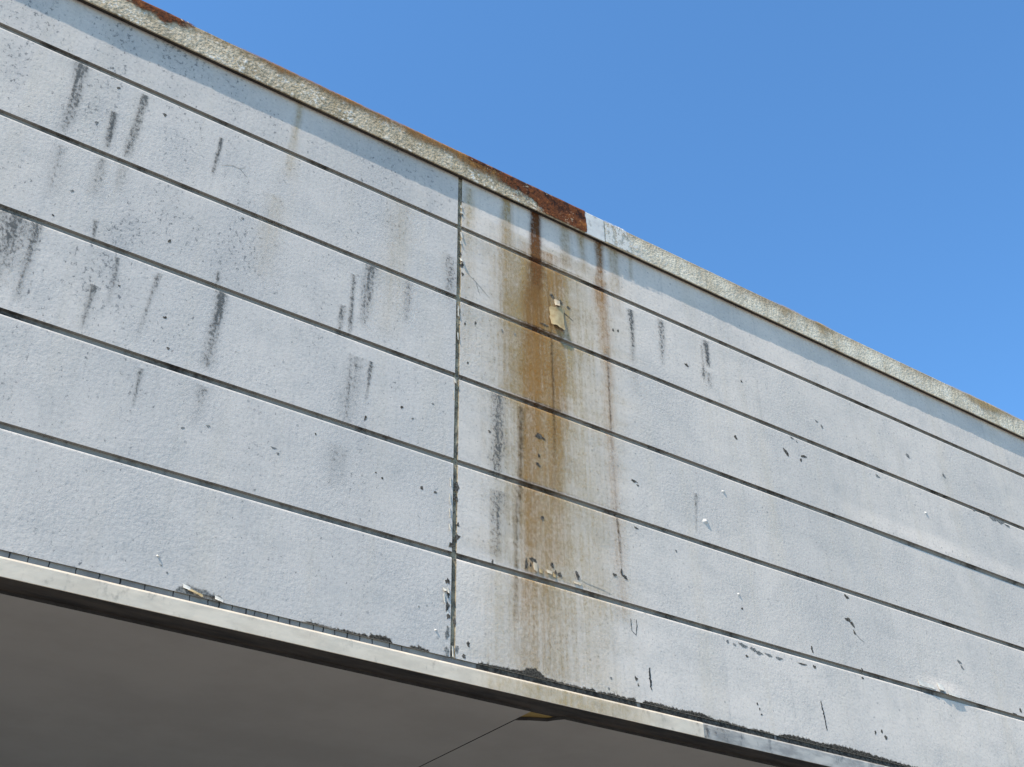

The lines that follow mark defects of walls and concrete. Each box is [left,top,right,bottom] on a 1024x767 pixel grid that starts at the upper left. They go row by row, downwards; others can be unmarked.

damp [65,63,88,123]
damp [0,205,42,283]
corrosion [263,58,587,497]
corrosion [596,241,615,273]
damp [206,273,226,365]
peeling [525,558,582,585]
spalling [443,578,915,767]